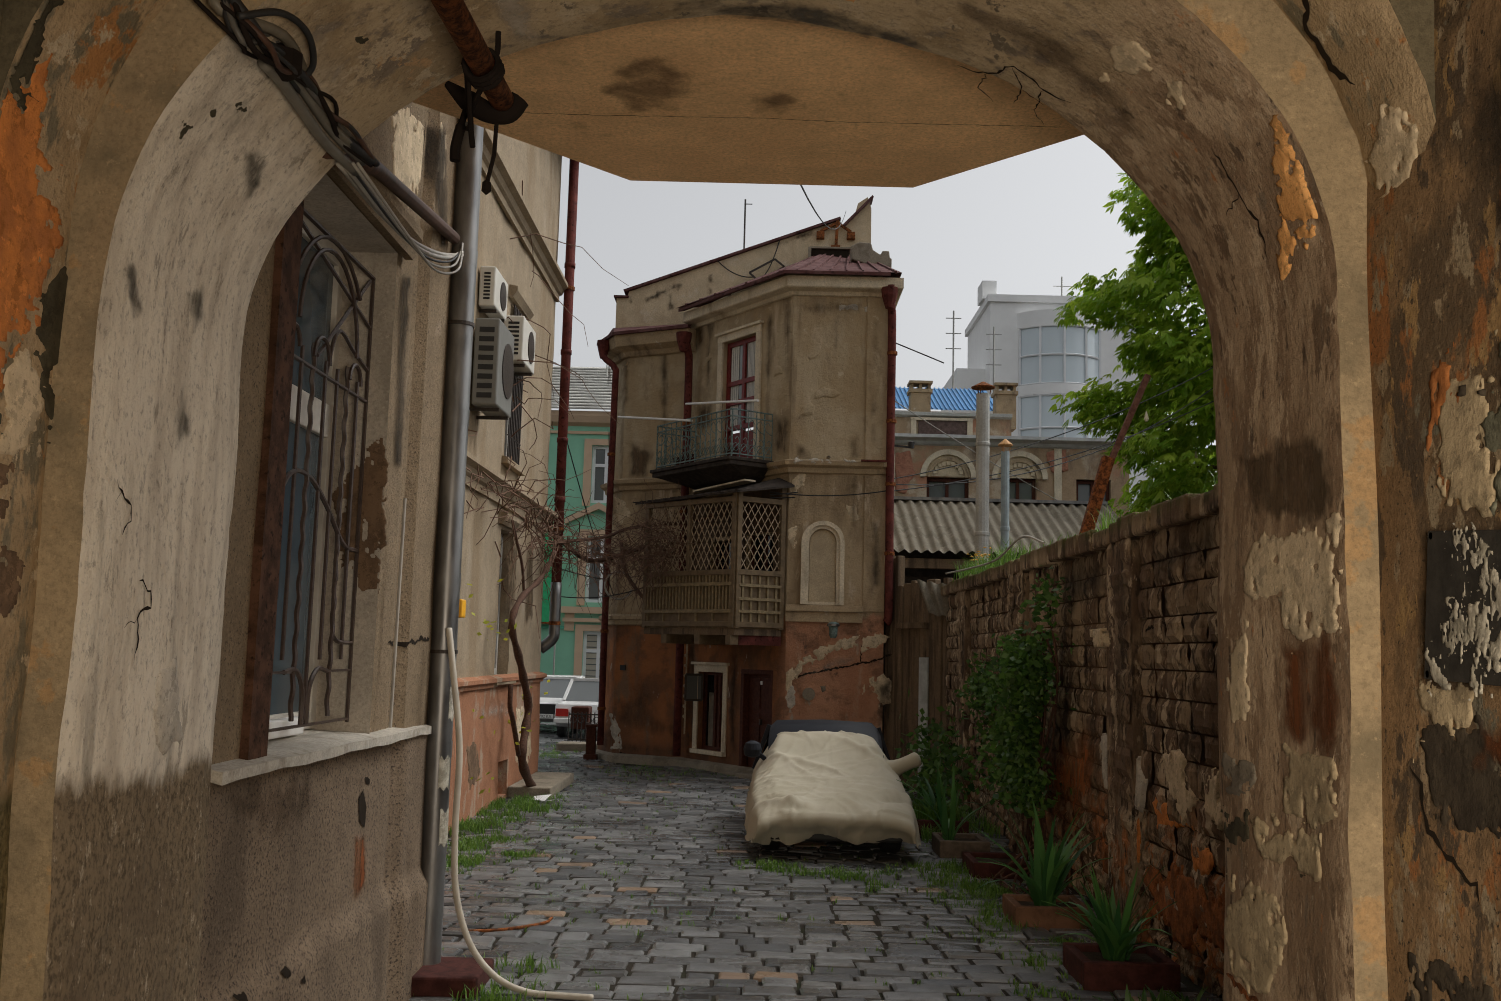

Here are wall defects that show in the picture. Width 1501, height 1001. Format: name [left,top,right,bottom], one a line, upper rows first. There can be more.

crack [1302,0,1355,85]
crack [767,66,1071,127]
peeling [1269,114,1318,281]
peeling [0,0,68,519]
peeling [1426,329,1501,518]
peeling [0,545,26,618]
crack [798,646,892,678]
peeling [1413,680,1501,839]
peeling [1404,952,1494,1001]